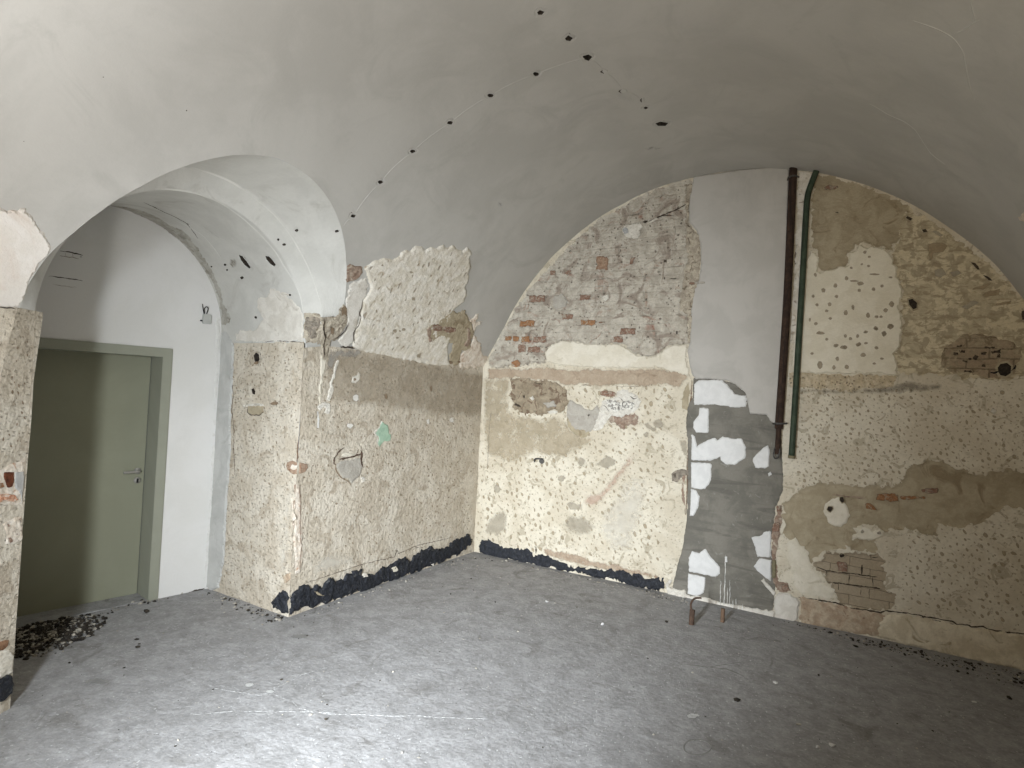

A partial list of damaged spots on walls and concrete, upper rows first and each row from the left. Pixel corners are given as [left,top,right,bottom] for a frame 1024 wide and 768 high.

spalling [303,179,705,416]
spalling [788,171,1024,393]
peeling [588,389,663,437]
spalling [0,457,26,545]
peeling [599,456,615,468]
peeling [666,378,1024,637]
peeling [0,640,14,678]
crack [799,597,1024,634]